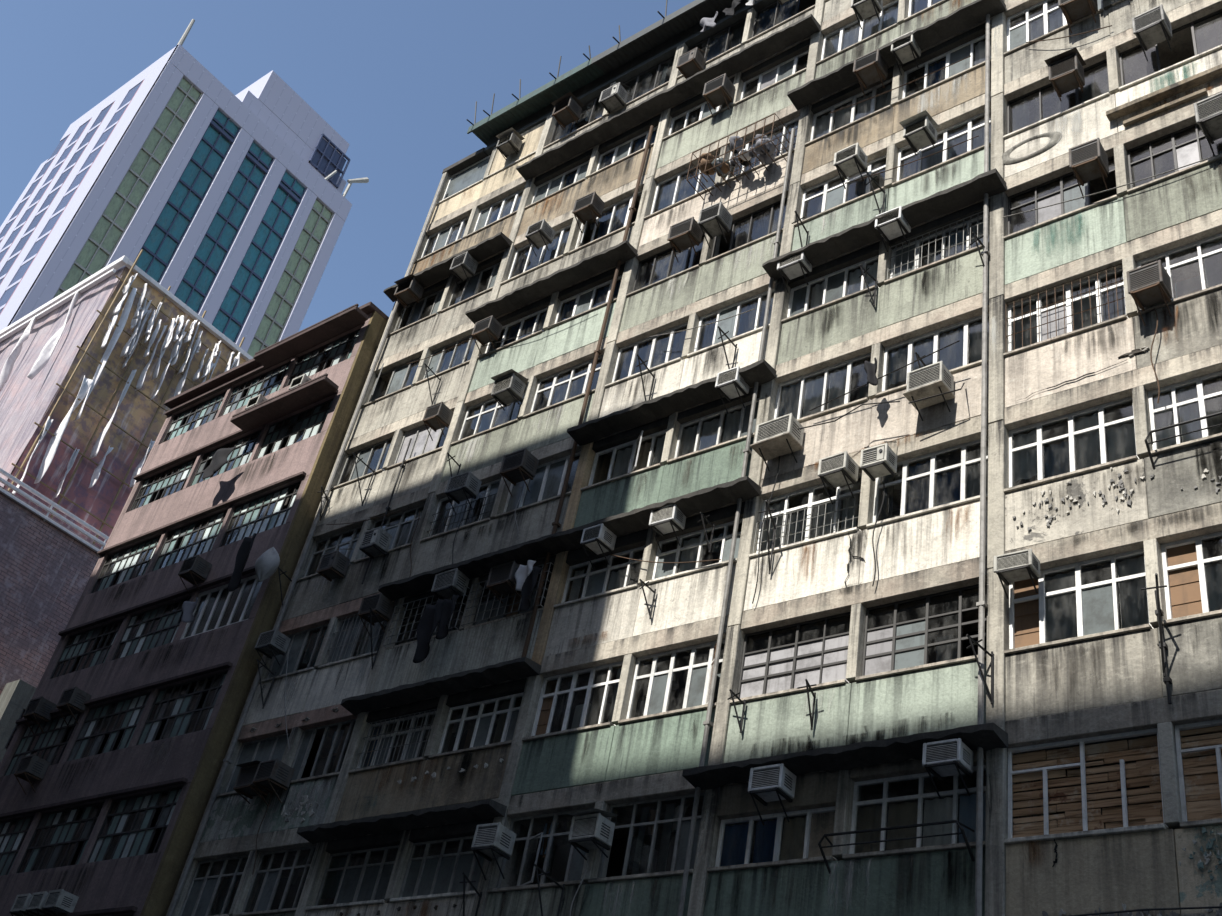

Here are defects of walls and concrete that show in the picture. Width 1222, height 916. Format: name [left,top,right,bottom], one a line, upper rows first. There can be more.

damp [1200,442,1221,472]
flaking render [1012,464,1155,531]
damp [771,735,815,756]